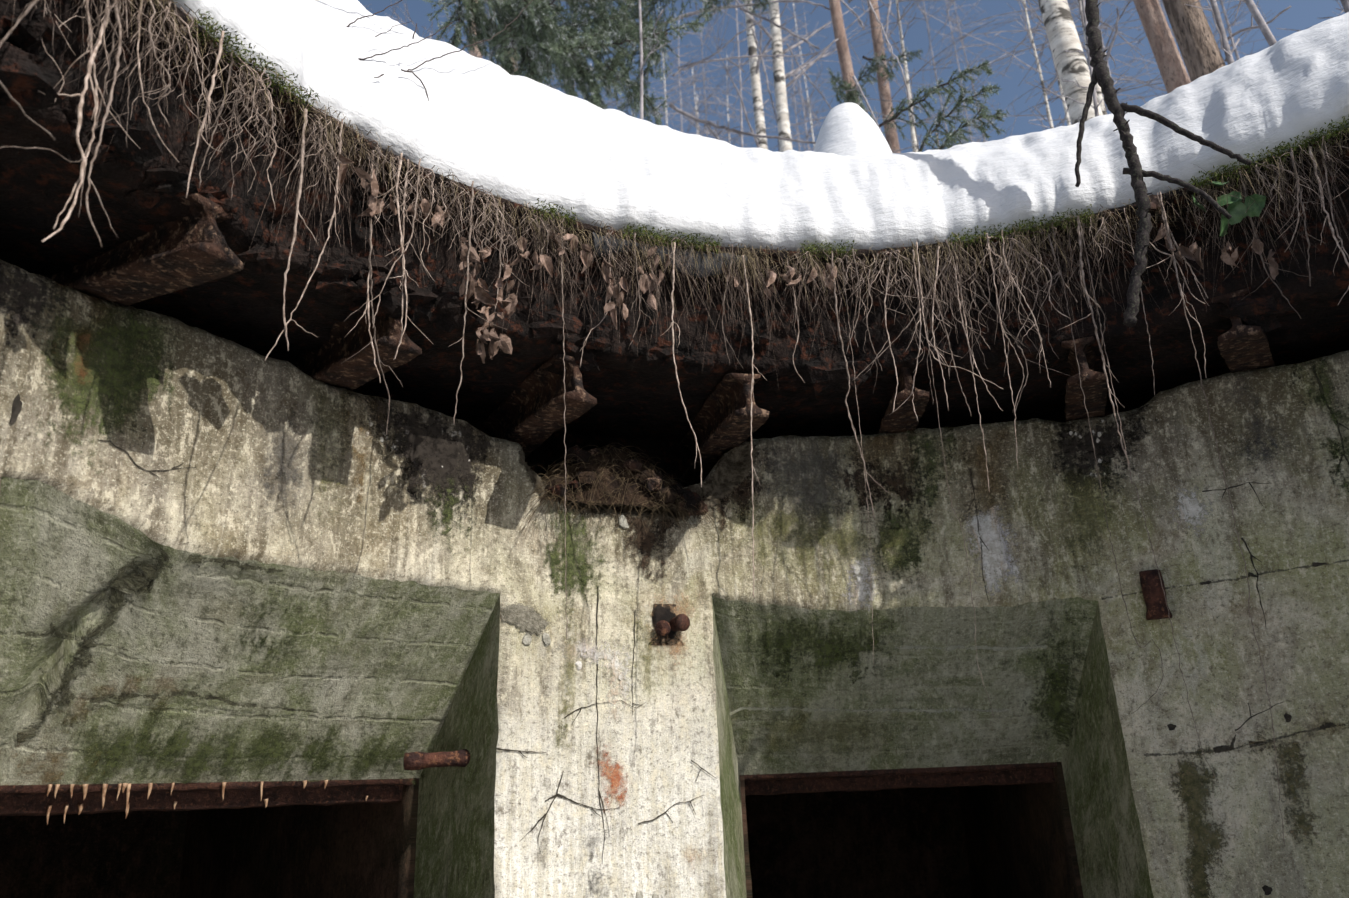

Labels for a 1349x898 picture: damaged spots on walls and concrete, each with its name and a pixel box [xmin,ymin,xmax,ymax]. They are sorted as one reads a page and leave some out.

water stain [344,393,509,535]
water stain [614,435,937,583]
crack [1202,482,1272,506]
water stain [550,549,593,614]
crack [1241,537,1266,627]
crack [16,546,319,743]
crack [496,587,717,864]
crack [1235,702,1283,731]
corrosion [599,754,627,805]